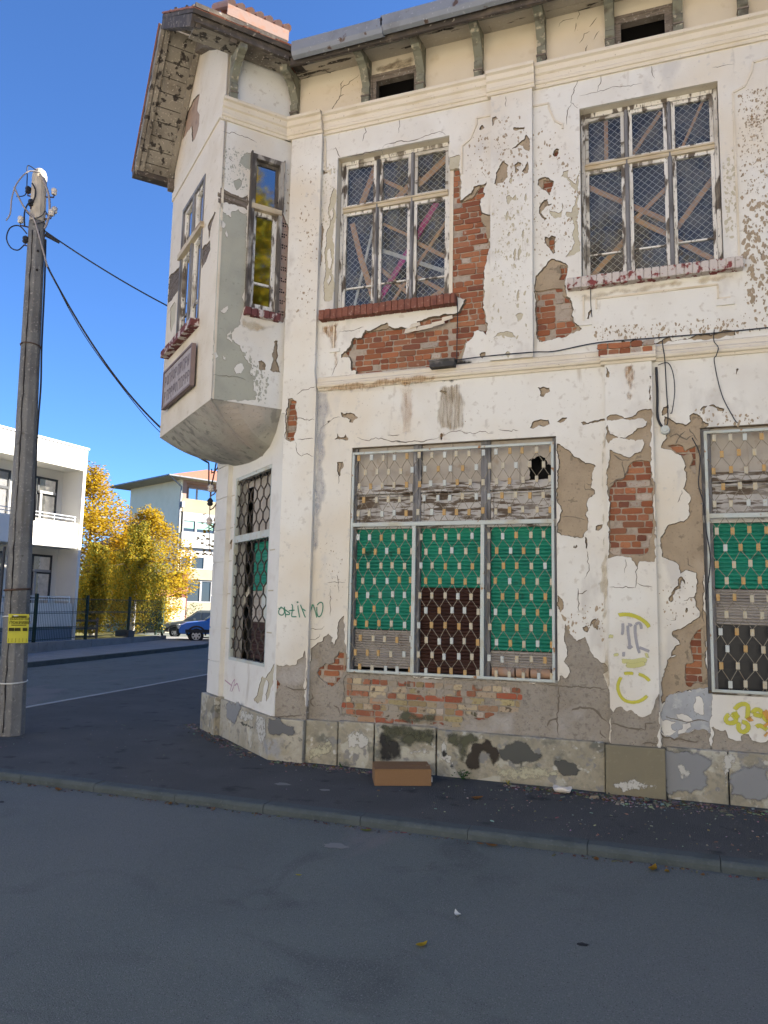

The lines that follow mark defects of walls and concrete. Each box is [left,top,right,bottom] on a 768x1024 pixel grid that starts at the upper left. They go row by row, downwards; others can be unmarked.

flaking render [184,95,200,140]
peeling [222,147,251,190]
peeling [209,207,278,403]
flaking render [342,87,768,374]
flaking render [254,377,768,753]
leakage [347,725,580,780]